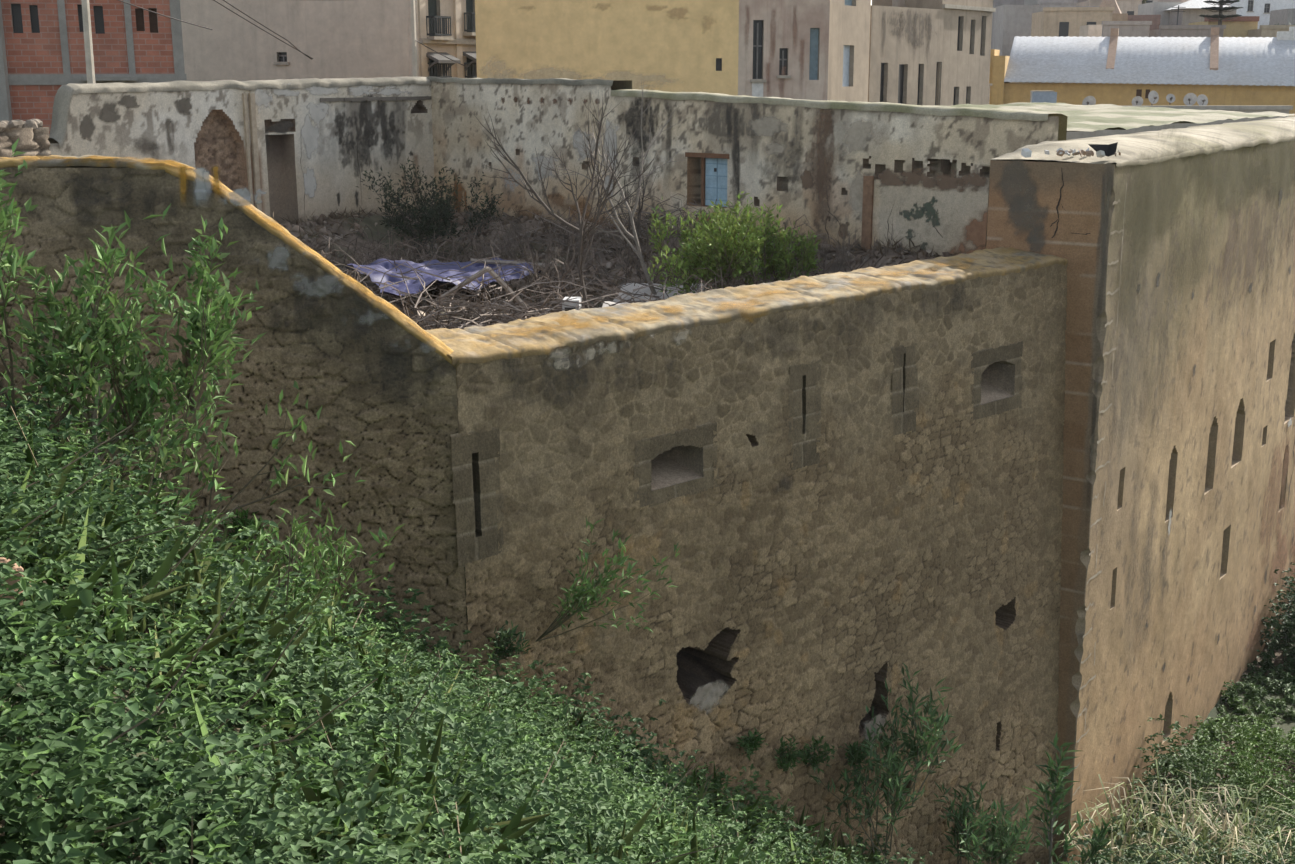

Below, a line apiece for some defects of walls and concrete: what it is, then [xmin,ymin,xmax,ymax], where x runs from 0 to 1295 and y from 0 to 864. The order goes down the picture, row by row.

flaking render [80,95,140,141]
flaking render [175,98,192,114]
water stain [335,95,404,175]
water stain [693,103,772,202]
water stain [774,109,834,220]
spalling [827,120,990,238]
spalling [949,211,987,256]
water stain [998,159,1047,252]
crack [1050,167,1090,238]
hole [676,627,741,712]
hole [859,661,889,749]